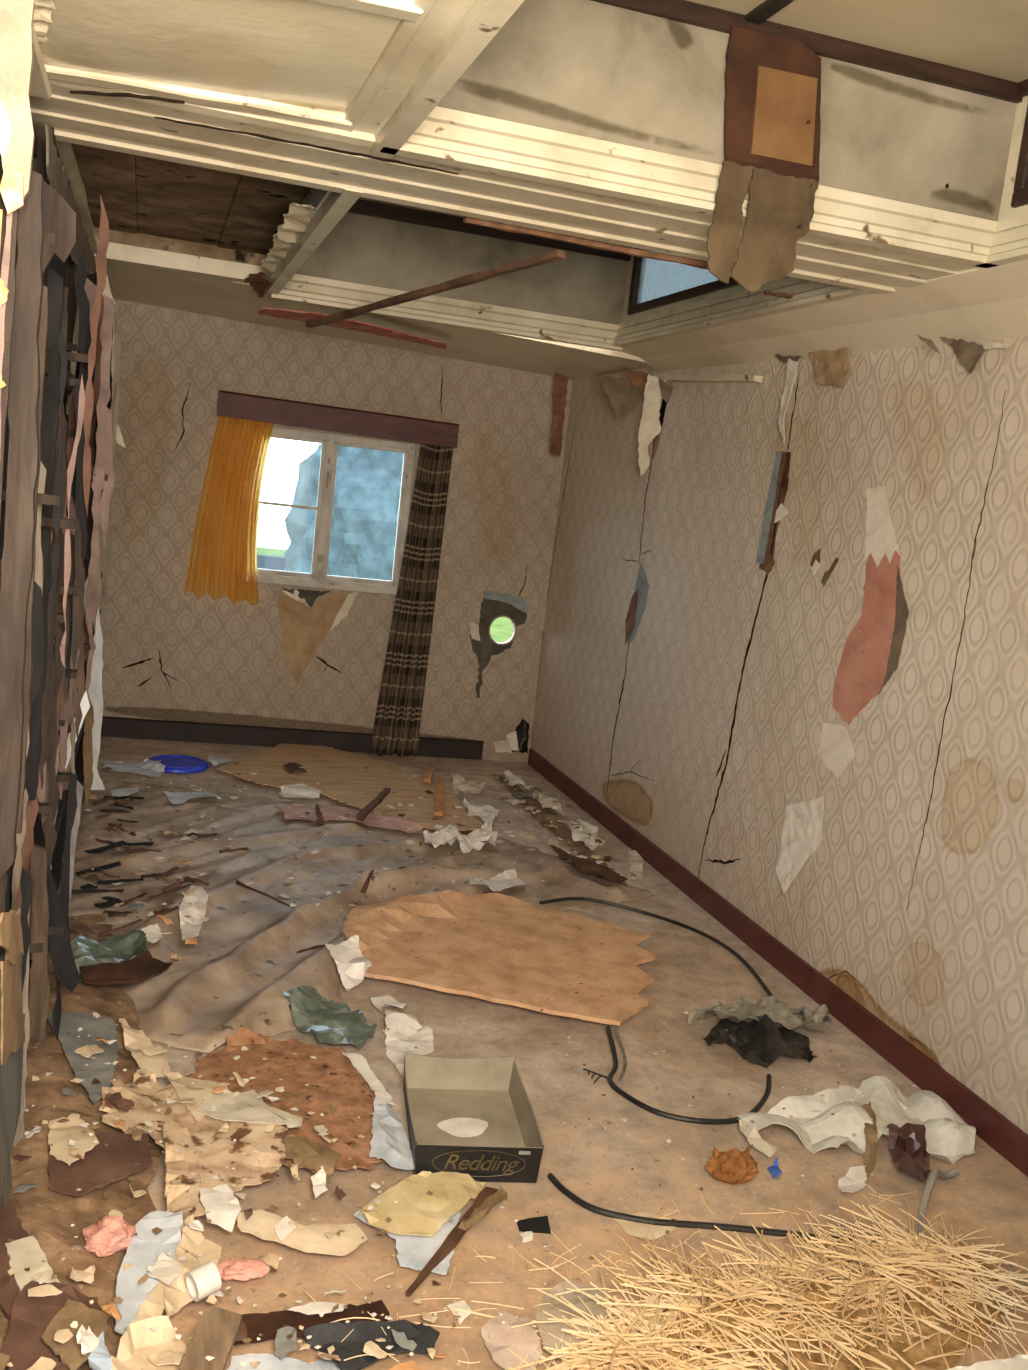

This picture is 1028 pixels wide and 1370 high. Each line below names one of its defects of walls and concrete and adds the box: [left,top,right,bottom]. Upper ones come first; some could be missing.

peeling [0,100,13,158]
spalling [0,180,19,521]
peeling [280,588,310,608]
peeling [469,622,480,641]
crack [623,440,655,562]
crack [698,376,799,878]
peeling [762,549,775,575]
peeling [774,503,789,523]
peeling [864,486,900,567]
crack [906,390,1006,910]
crack [607,637,652,789]
peeling [775,796,824,894]